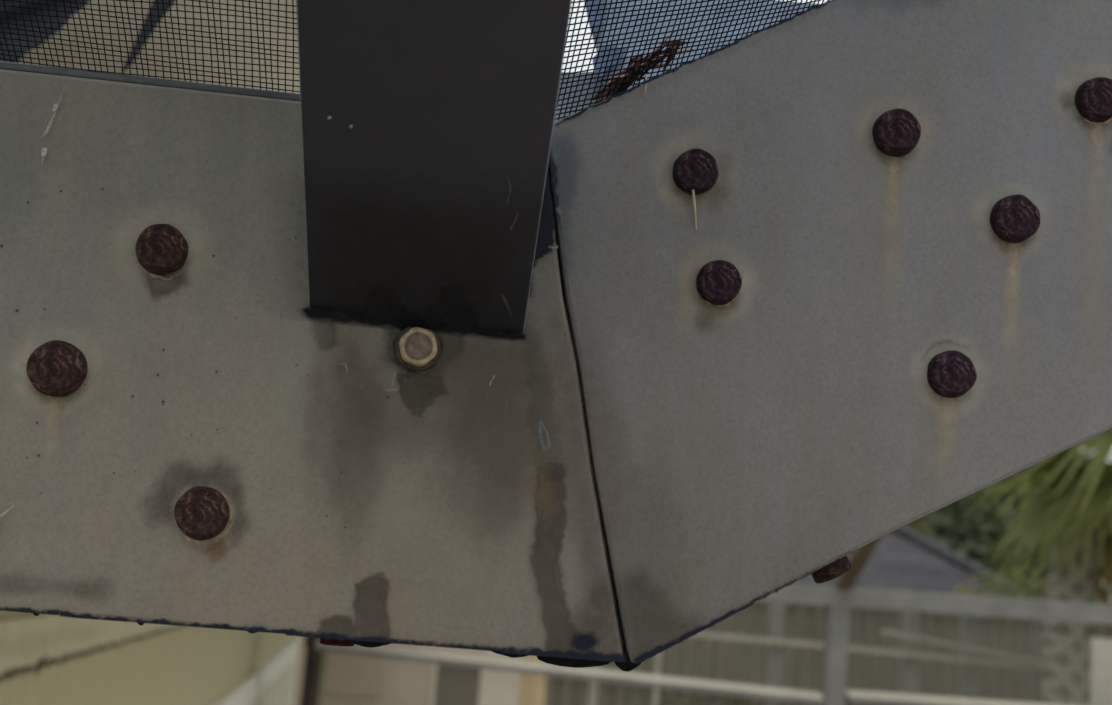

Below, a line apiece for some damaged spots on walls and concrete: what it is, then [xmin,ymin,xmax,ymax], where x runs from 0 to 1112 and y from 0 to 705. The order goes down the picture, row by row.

water stain [388,328,463,416]
water stain [531,463,619,654]
water stain [317,573,390,639]
water stain [0,626,180,682]